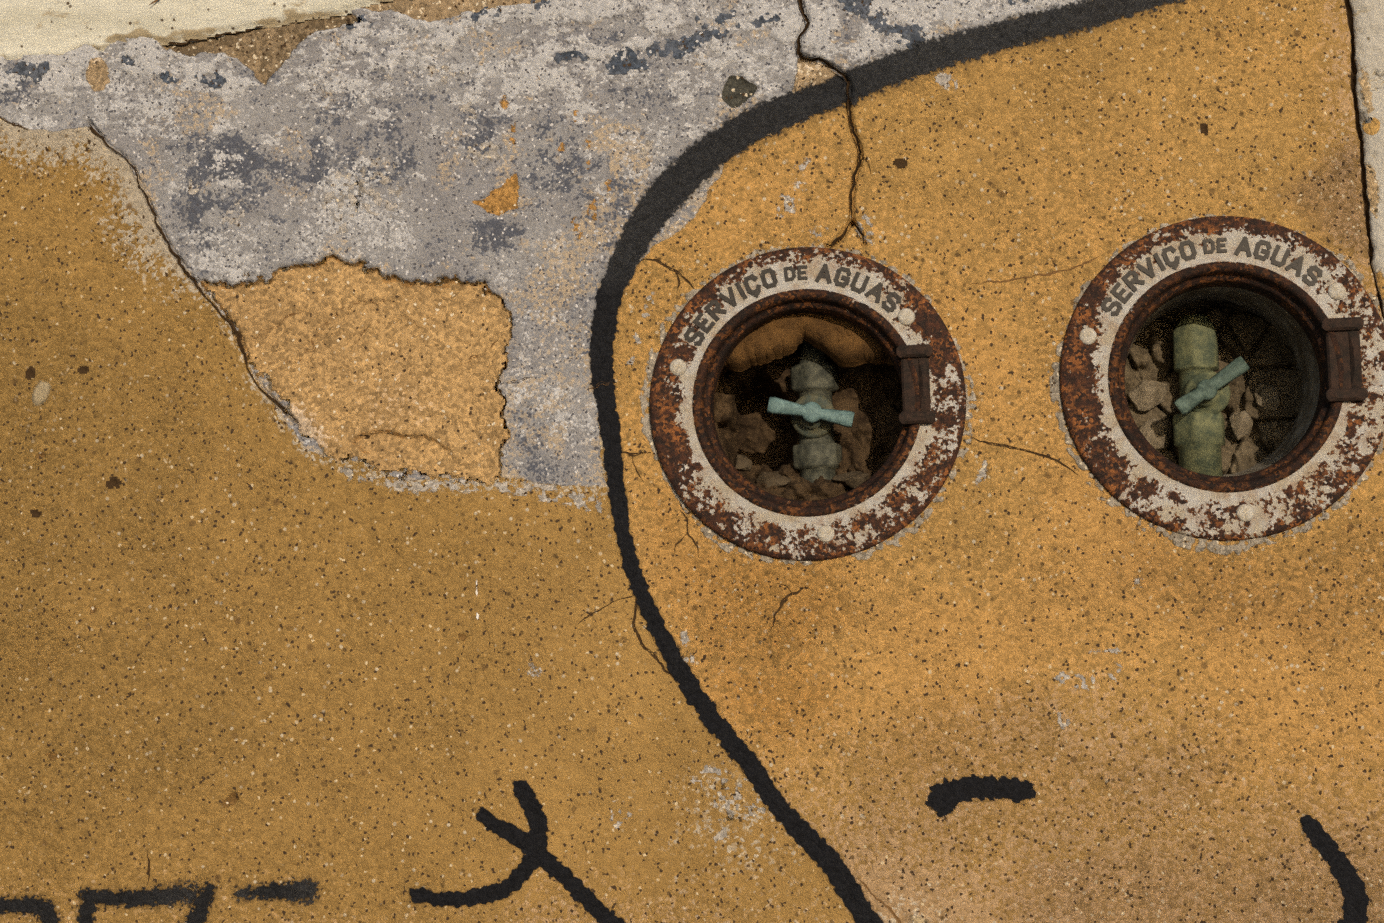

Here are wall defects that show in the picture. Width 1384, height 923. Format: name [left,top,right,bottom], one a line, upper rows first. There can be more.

crack [89,124,419,422]
peeling [0,0,1087,513]
crack [787,0,871,247]
crack [1344,0,1384,319]